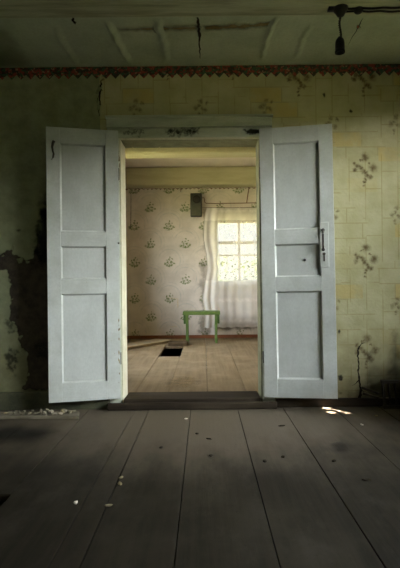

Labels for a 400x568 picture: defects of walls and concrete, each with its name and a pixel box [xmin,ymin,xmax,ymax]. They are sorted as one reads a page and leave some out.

crack [194,17,202,54]
peeling [34,343,48,358]
crack [352,342,367,398]